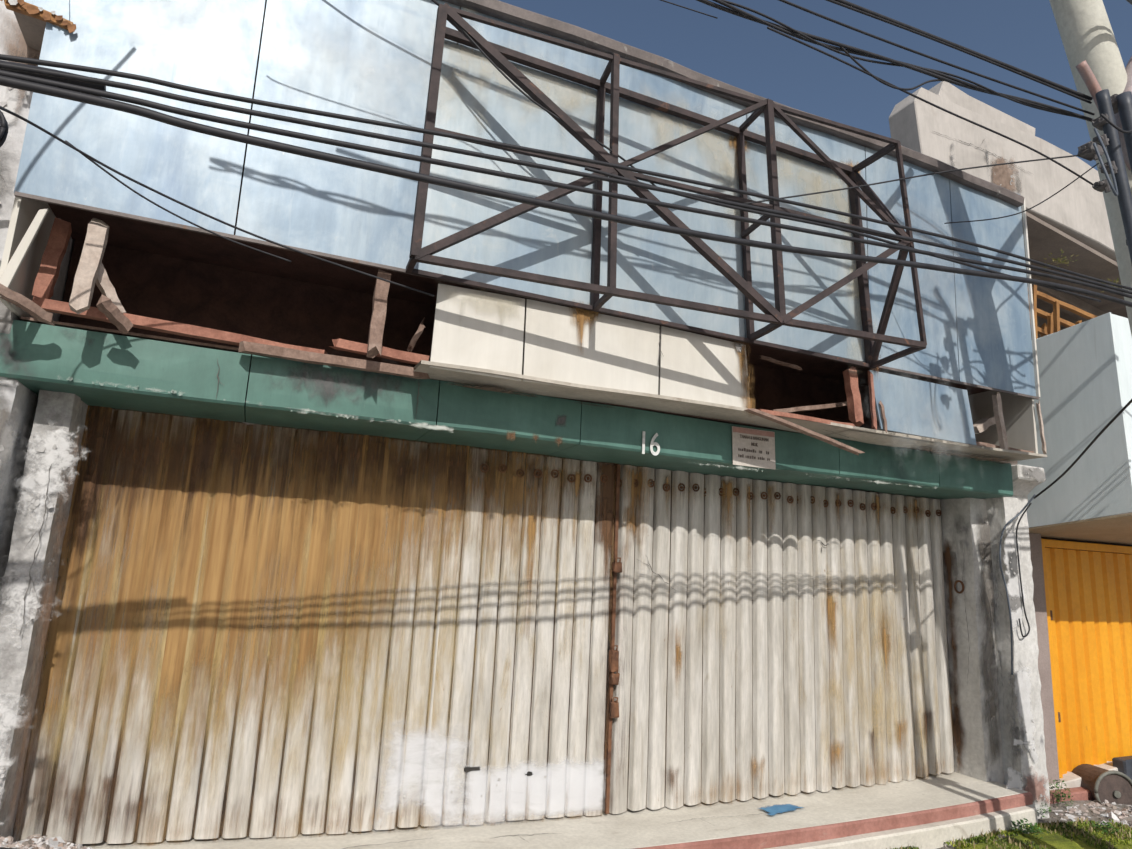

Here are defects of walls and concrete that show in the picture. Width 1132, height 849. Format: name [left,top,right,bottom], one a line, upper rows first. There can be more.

rust [572,307,599,347]
flaking render [0,377,18,463]
flaking render [15,429,86,529]
crack [20,464,52,635]
rust [38,405,581,734]
rust [827,597,836,635]
rust [943,543,964,765]
damp [979,520,1023,760]
rust [22,759,87,820]